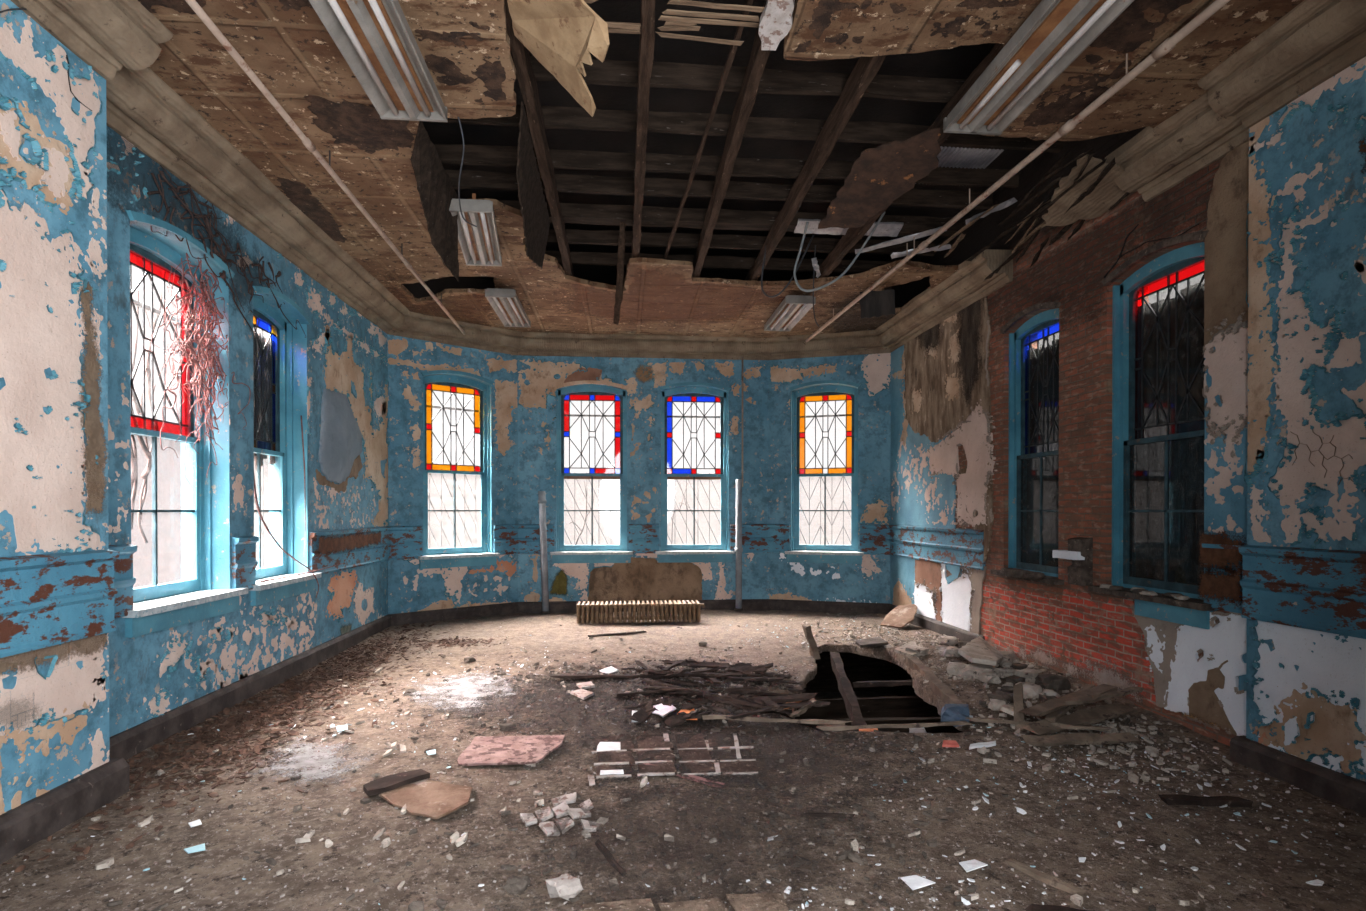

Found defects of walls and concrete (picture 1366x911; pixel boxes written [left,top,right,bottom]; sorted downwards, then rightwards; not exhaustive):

water stain [304,95,414,154]
water stain [415,21,507,103]
peeling [0,7,149,555]
peeling [1202,57,1366,551]
flaking render [277,252,837,528]
crack [1291,429,1353,485]
peeling [141,568,384,718]
flaking render [401,553,733,612]
flaking render [768,297,1366,778]
peeling [0,633,110,815]
peeling [1009,736,1359,877]
peeling [746,879,837,911]